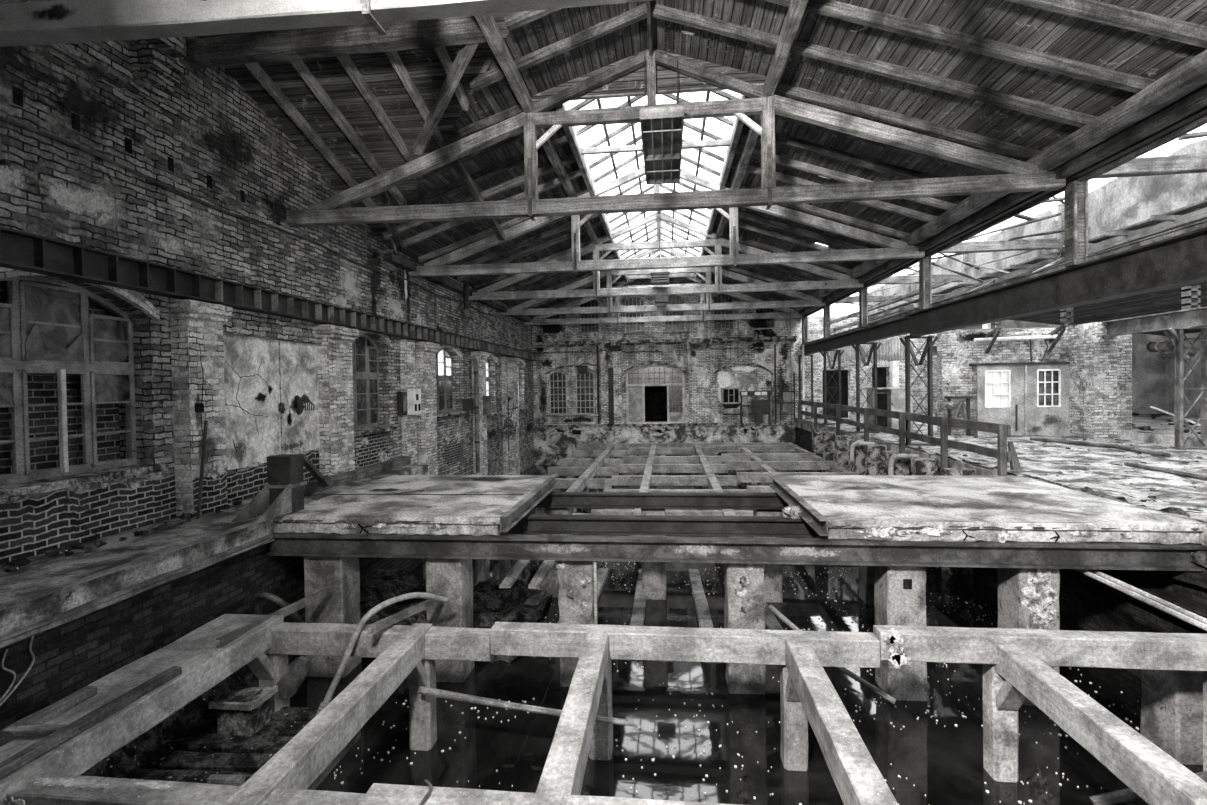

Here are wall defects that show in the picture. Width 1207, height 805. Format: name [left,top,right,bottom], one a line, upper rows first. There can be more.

water stain [34,5,70,20]
water stain [193,125,256,171]
water stain [261,192,288,225]
crack [199,344,269,448]
spalling [795,427,812,453]
spalling [905,447,1207,523]
spalling [857,526,953,538]
spalling [997,529,1008,543]
spalling [973,567,998,590]
spalling [1059,543,1207,634]
spalling [884,628,911,669]